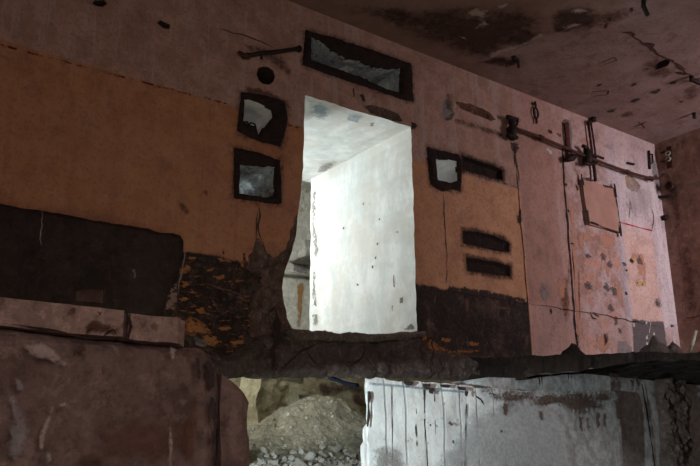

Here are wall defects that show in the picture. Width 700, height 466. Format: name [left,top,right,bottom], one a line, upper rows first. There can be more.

water stain [375,9,538,66]
water stain [555,9,627,32]
crack [623,32,697,80]
spalling [184,213,298,347]
water stain [448,286,525,306]
spalling [653,378,694,466]